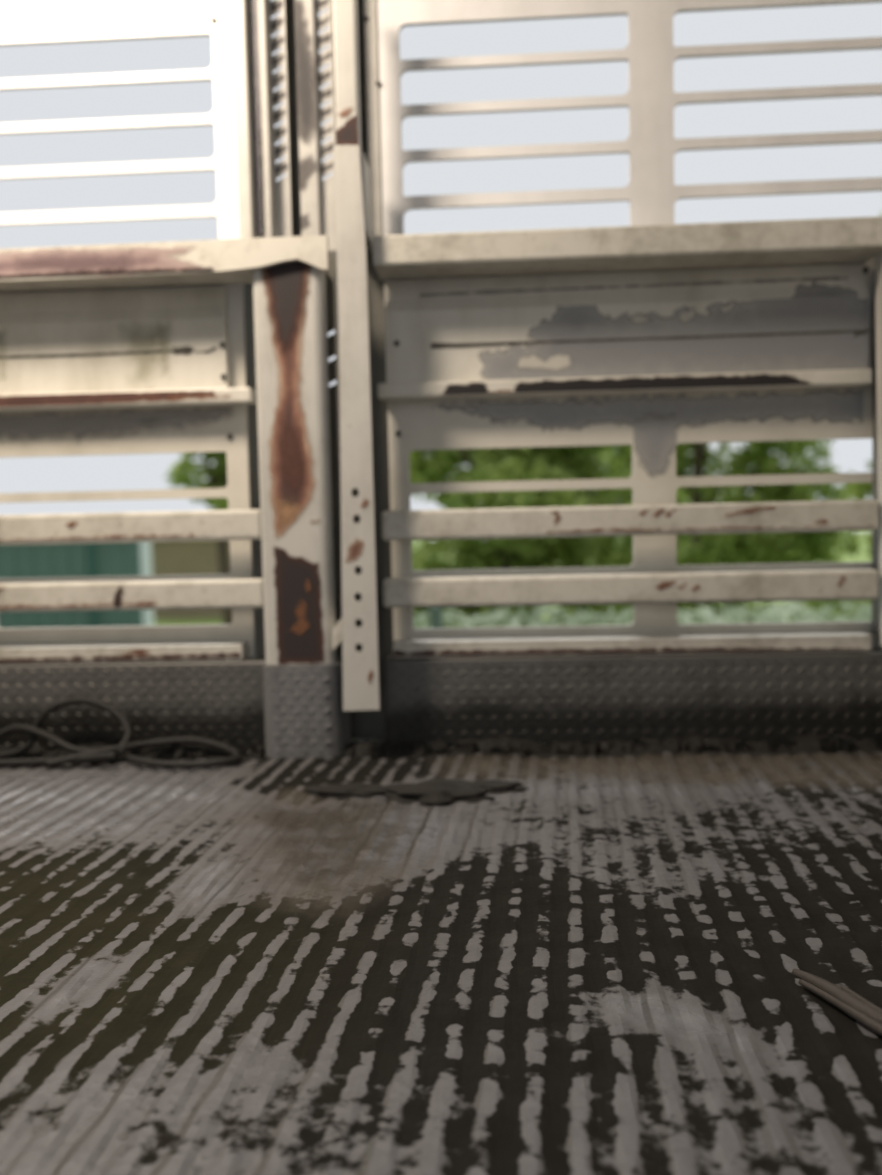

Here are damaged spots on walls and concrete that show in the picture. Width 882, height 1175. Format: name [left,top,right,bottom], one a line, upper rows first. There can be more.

corrosion [0,247,213,278]
peeling [479,282,868,380]
corrosion [0,390,229,407]
corrosion [262,261,324,664]
peeling [438,389,863,475]